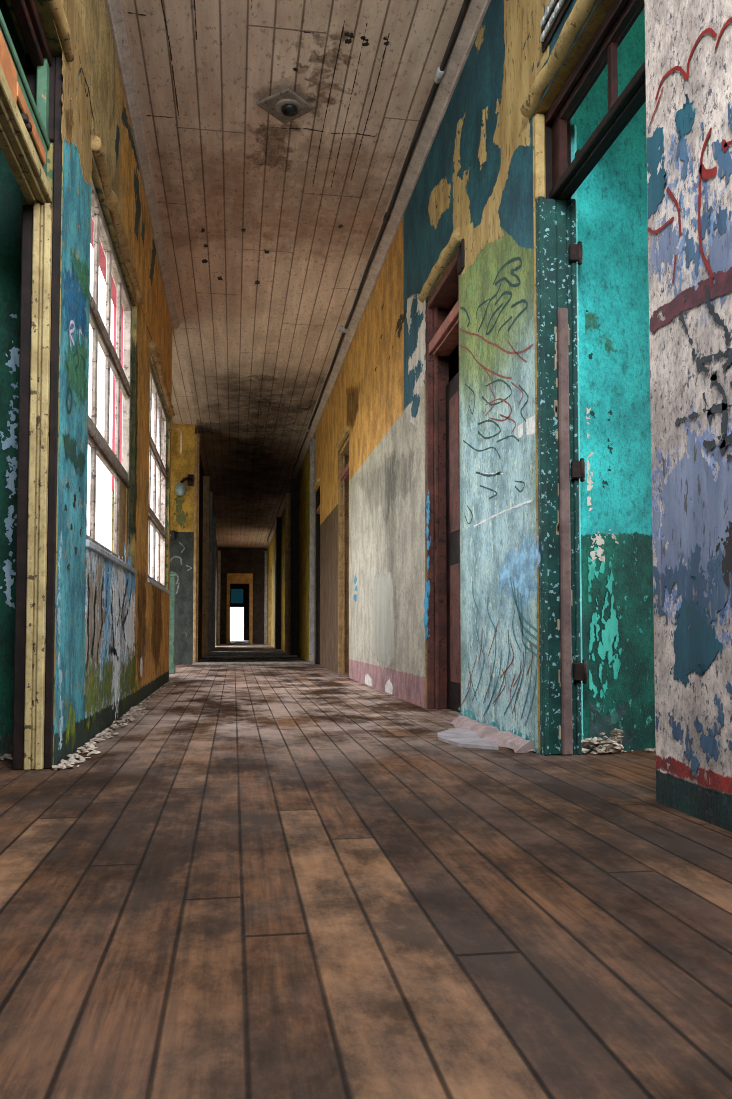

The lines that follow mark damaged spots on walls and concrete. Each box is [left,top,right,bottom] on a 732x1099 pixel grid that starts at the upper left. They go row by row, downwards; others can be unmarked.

peeling [647,94,732,285]
spalling [0,341,20,609]
peeling [56,523,143,751]
leakage [208,377,316,525]
peeling [587,438,613,511]
peeling [588,529,622,724]
peeling [652,418,732,688]
spalling [655,681,732,777]